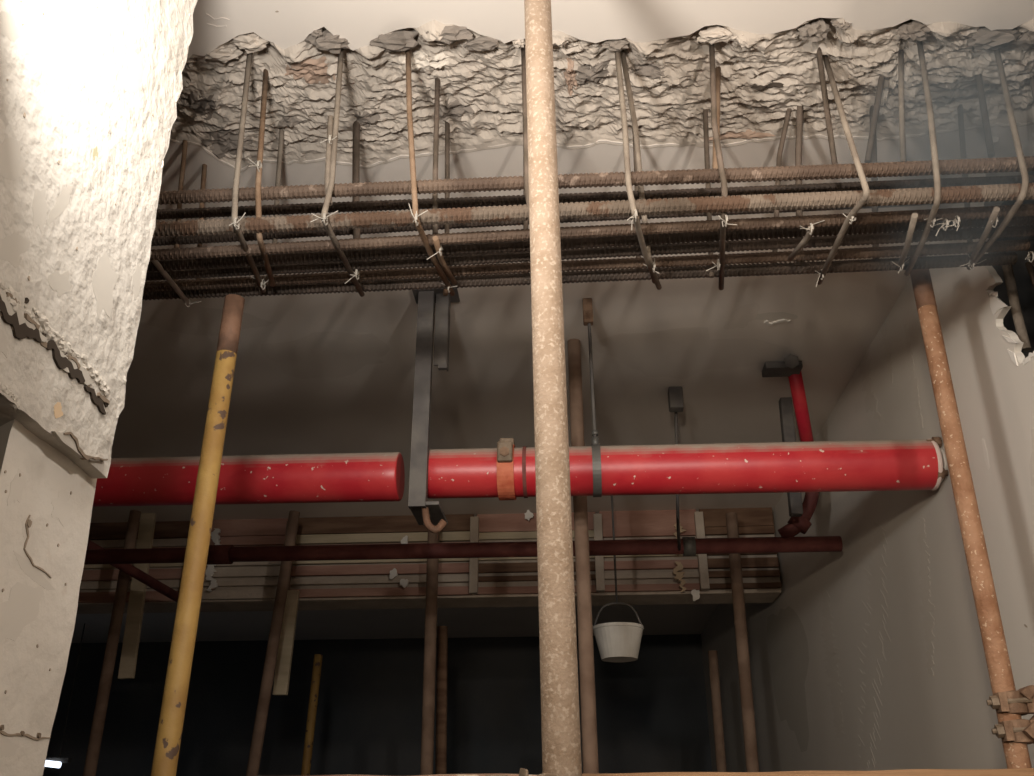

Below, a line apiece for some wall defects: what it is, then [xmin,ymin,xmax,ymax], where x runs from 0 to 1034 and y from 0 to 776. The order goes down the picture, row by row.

spalling [179,91,258,159]
spalling [285,56,336,84]
spalling [398,50,451,71]
spalling [439,98,478,121]
spalling [563,58,610,96]
spalling [916,76,989,107]
spalling [142,176,531,300]
spalling [558,156,1034,284]
flaking render [990,292,1007,316]
spalling [0,279,110,411]
crack [23,515,52,578]
crack [0,730,51,740]